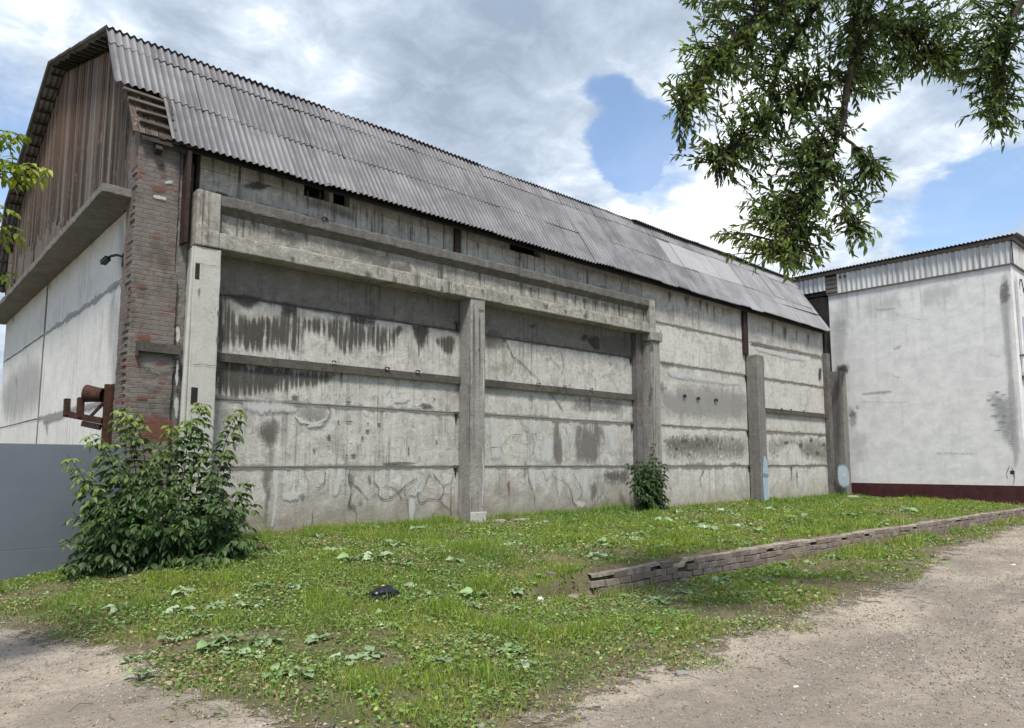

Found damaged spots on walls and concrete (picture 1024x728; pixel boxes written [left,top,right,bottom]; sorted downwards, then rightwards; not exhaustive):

leakage [219,296,229,379]
leakage [244,317,268,351]
crack [306,469,454,516]
crack [492,342,610,506]
leakage [528,422,625,507]